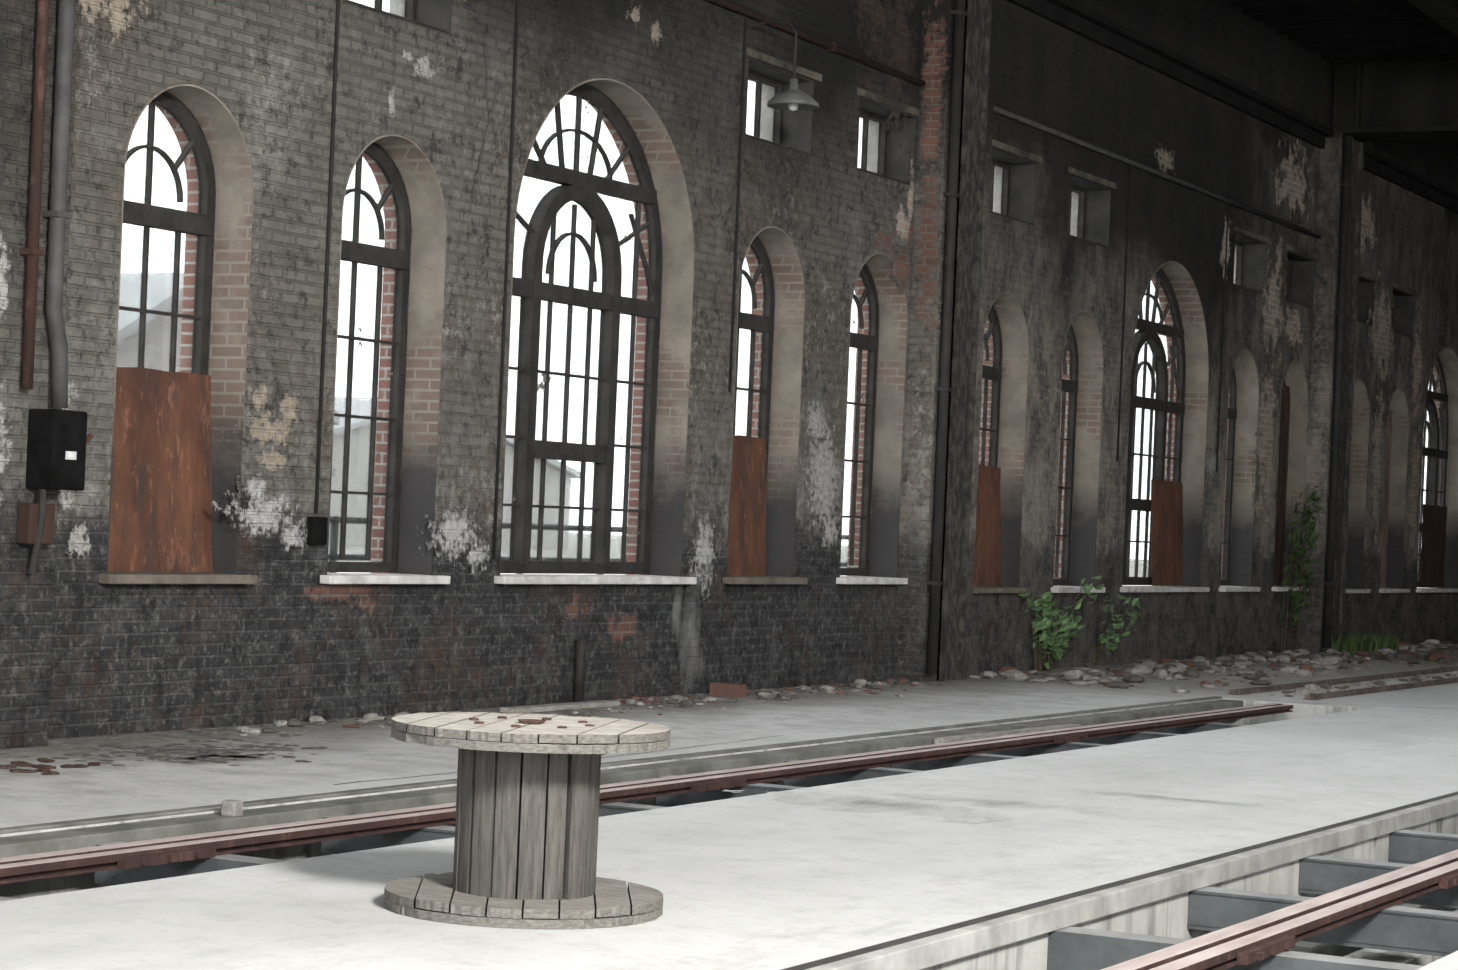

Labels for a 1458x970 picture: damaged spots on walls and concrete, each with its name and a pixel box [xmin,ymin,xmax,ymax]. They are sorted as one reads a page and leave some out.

flaking render [79,0,150,44]
peeling [0,216,13,325]
peeling [0,374,15,516]
rust [108,367,213,572]
peeling [249,532,292,564]
rust [727,435,767,576]
rust [973,465,1002,586]
rust [1151,480,1183,586]